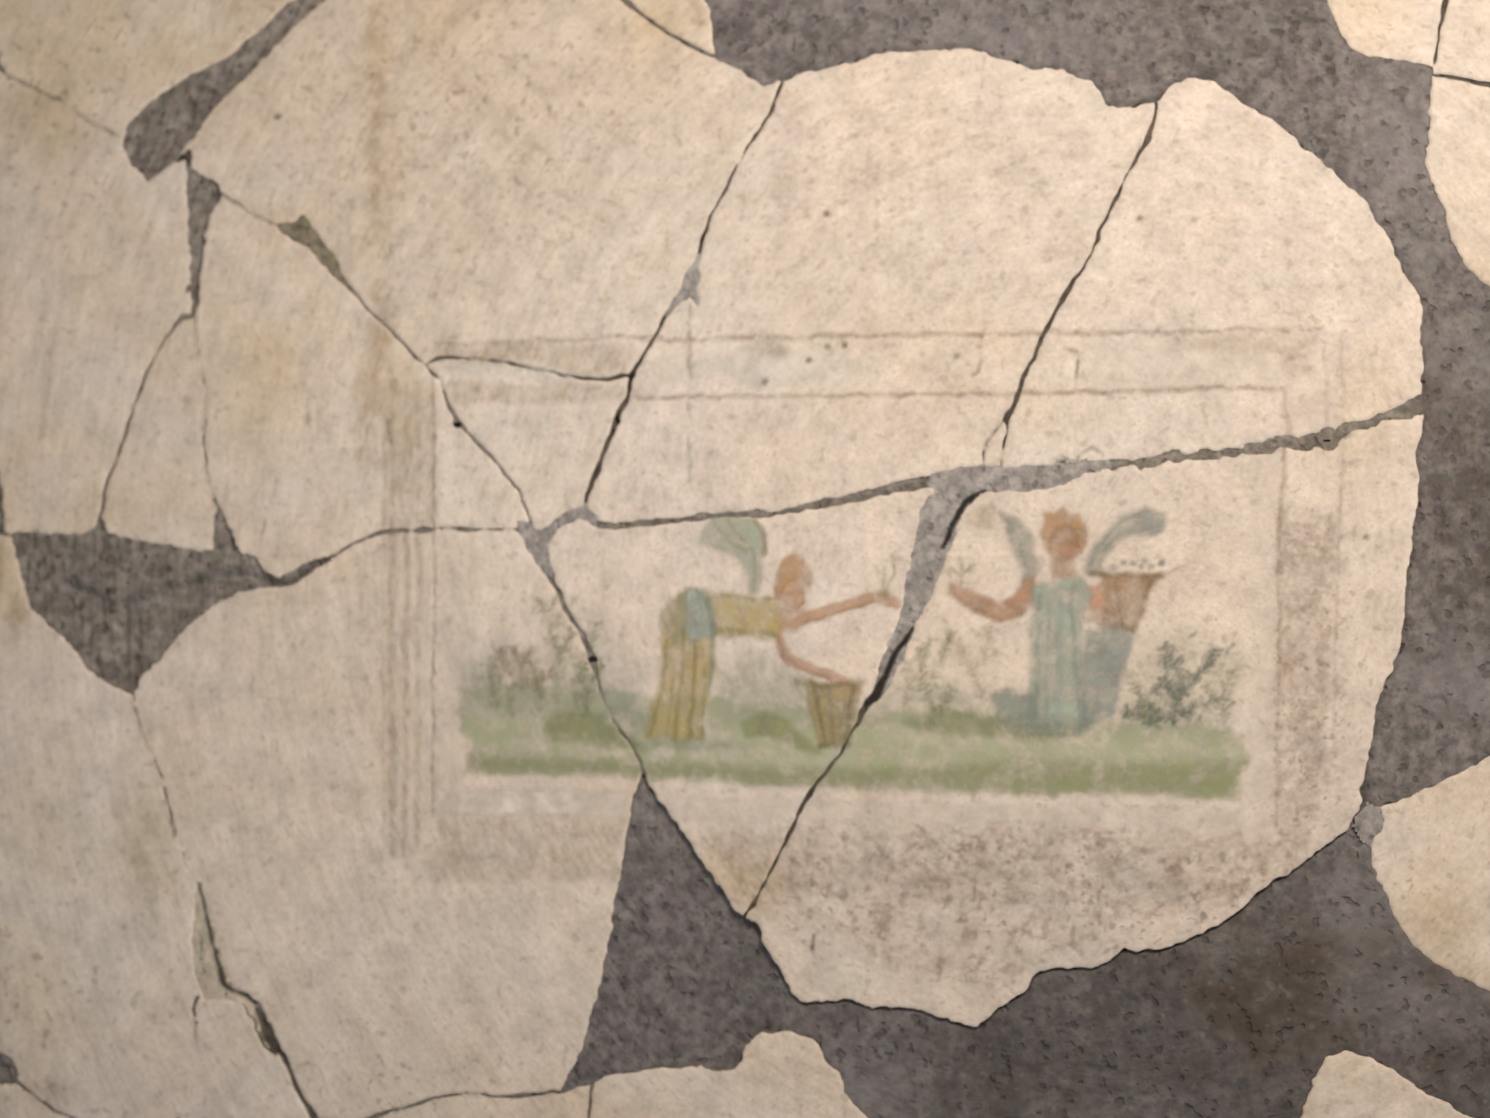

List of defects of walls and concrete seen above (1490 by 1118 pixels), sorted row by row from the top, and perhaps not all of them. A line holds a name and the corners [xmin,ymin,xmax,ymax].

crack [620,0,709,56]
crack [1434,0,1490,88]
crack [177,150,192,167]
crack [330,83,1158,556]
crack [102,314,195,513]
crack [1110,395,1423,471]
crack [546,573,647,779]
crack [745,627,914,917]
crack [193,885,318,1118]
crack [368,1090,554,1118]
crack [586,1090,594,1118]